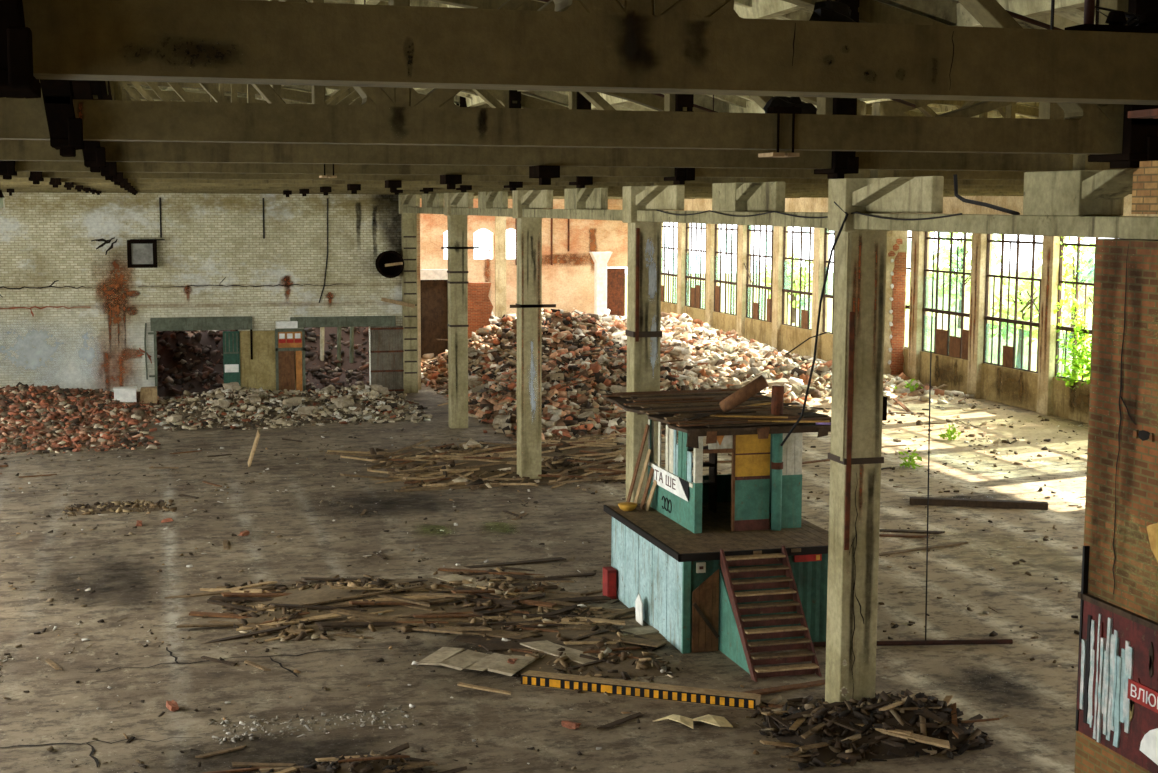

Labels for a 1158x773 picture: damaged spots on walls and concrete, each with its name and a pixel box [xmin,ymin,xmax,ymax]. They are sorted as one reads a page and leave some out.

leakage [620,12,654,66]
rust [98,259,143,389]
rust [852,236,878,424]